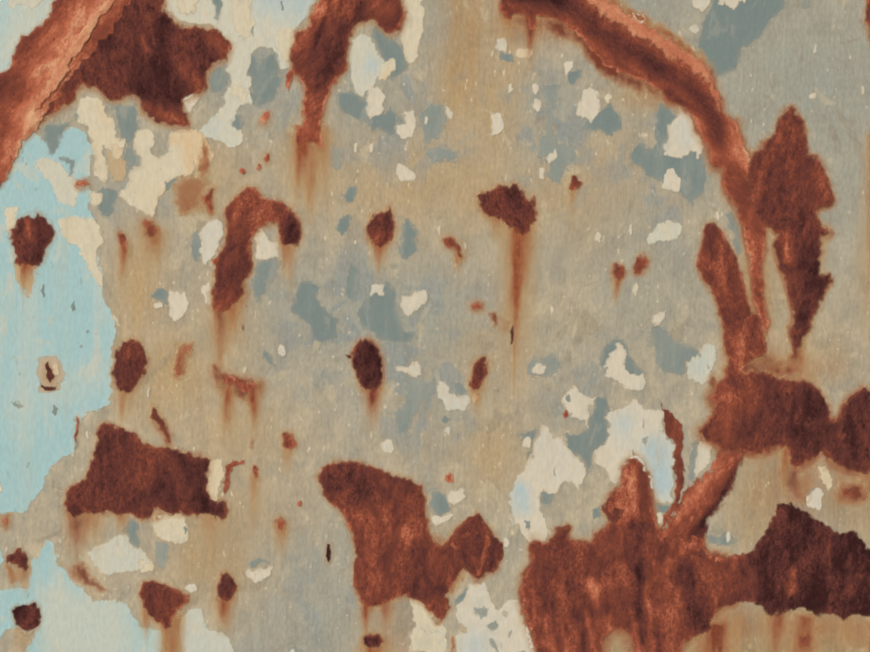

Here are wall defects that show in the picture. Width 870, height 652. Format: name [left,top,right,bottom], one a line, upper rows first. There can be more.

rust [0,0,232,183]
rust [286,0,406,198]
peeling [631,104,707,205]
peeling [0,0,316,515]
rust [195,187,302,423]
rust [498,0,870,652]
peeling [0,540,163,652]
peeling [87,514,188,576]
rust [64,407,258,544]
rust [317,460,503,652]
peeling [410,582,534,652]
peeling [508,340,675,542]